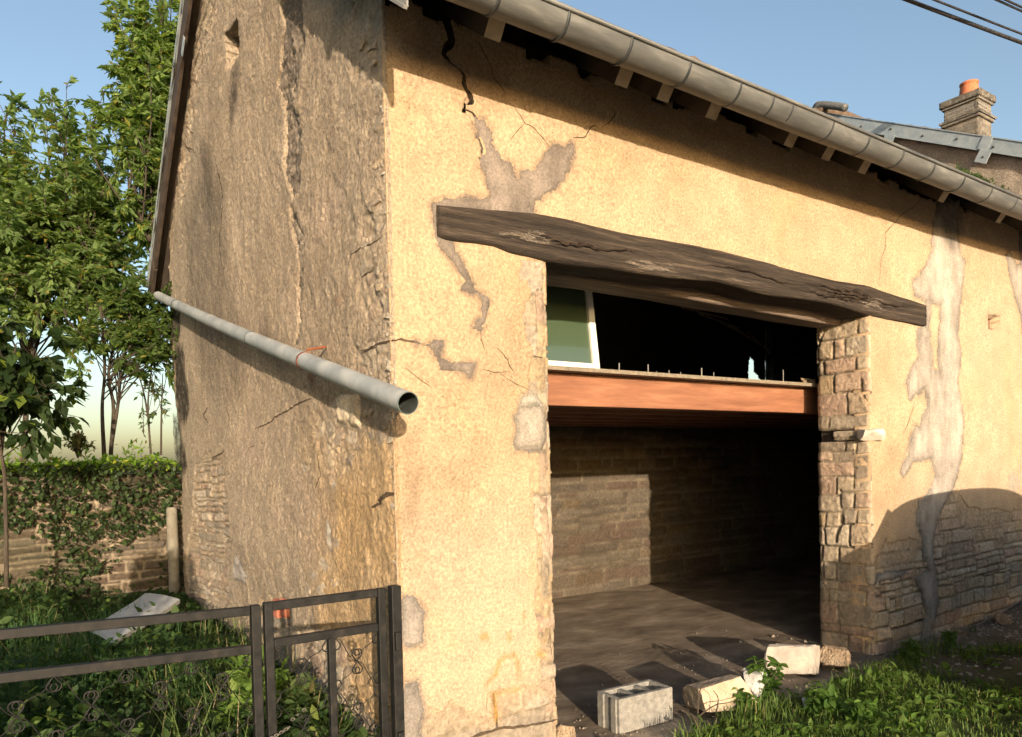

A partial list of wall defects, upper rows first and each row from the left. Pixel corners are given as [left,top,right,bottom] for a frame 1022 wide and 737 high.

crack [438,20,548,158]
crack [574,108,616,138]
flaking render [188,452,236,609]
crack [248,398,311,449]
flaking render [421,260,576,737]
flaking render [865,489,1022,657]